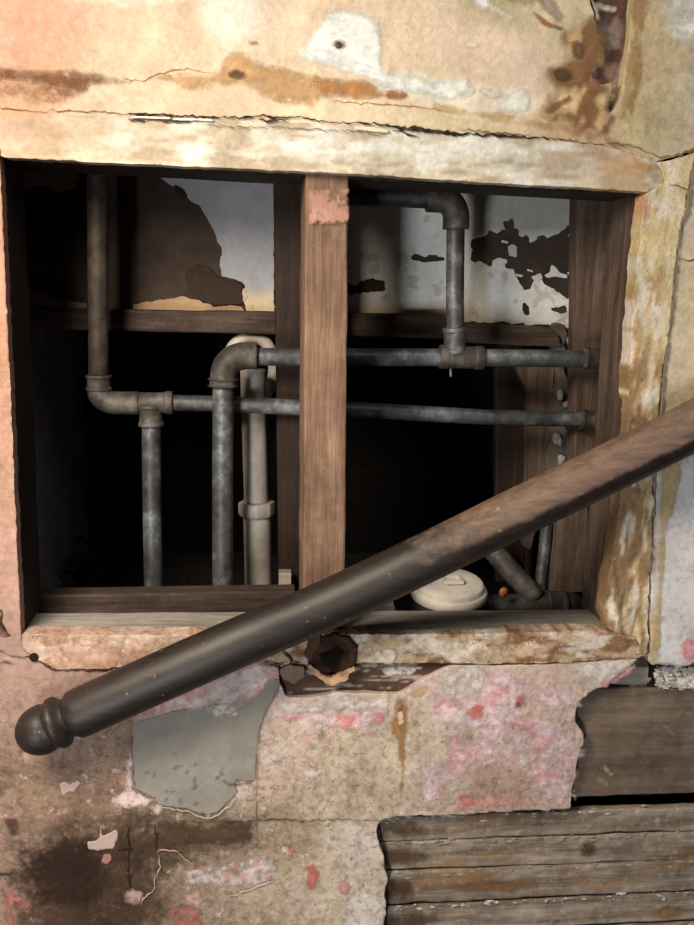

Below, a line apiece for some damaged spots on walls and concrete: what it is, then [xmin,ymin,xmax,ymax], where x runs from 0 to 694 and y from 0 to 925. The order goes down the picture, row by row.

corrosion [312,78,456,113]
peeling [299,11,529,112]
flaking render [536,0,628,134]
crack [1,107,694,415]
crack [650,473,658,577]
peeling [646,454,694,687]
flaking render [112,649,582,819]
corrosion [391,688,426,759]
leakage [6,819,18,834]
crack [121,826,133,889]
leakage [13,815,252,925]
crack [154,797,382,854]